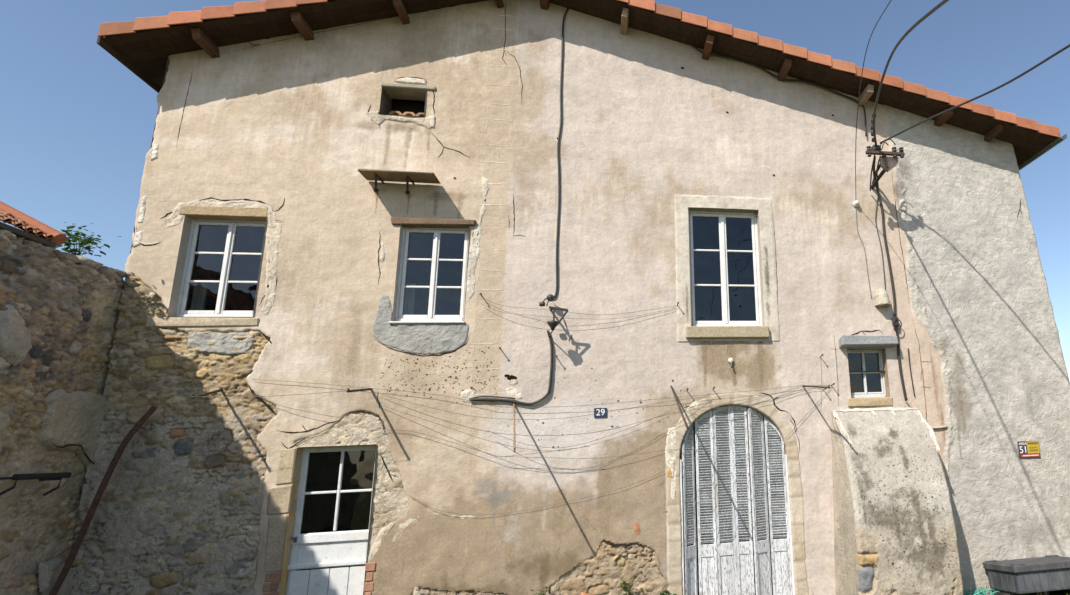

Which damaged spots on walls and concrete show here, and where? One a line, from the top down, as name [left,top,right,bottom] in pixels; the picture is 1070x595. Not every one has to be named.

crack [249,0,523,97]
crack [394,77,470,158]
spalling [133,196,147,247]
flaking render [167,200,282,315]
spalling [39,275,278,595]
flaking render [293,412,474,563]
spalling [410,579,504,595]
spalling [546,522,671,595]
leakage [871,500,944,577]